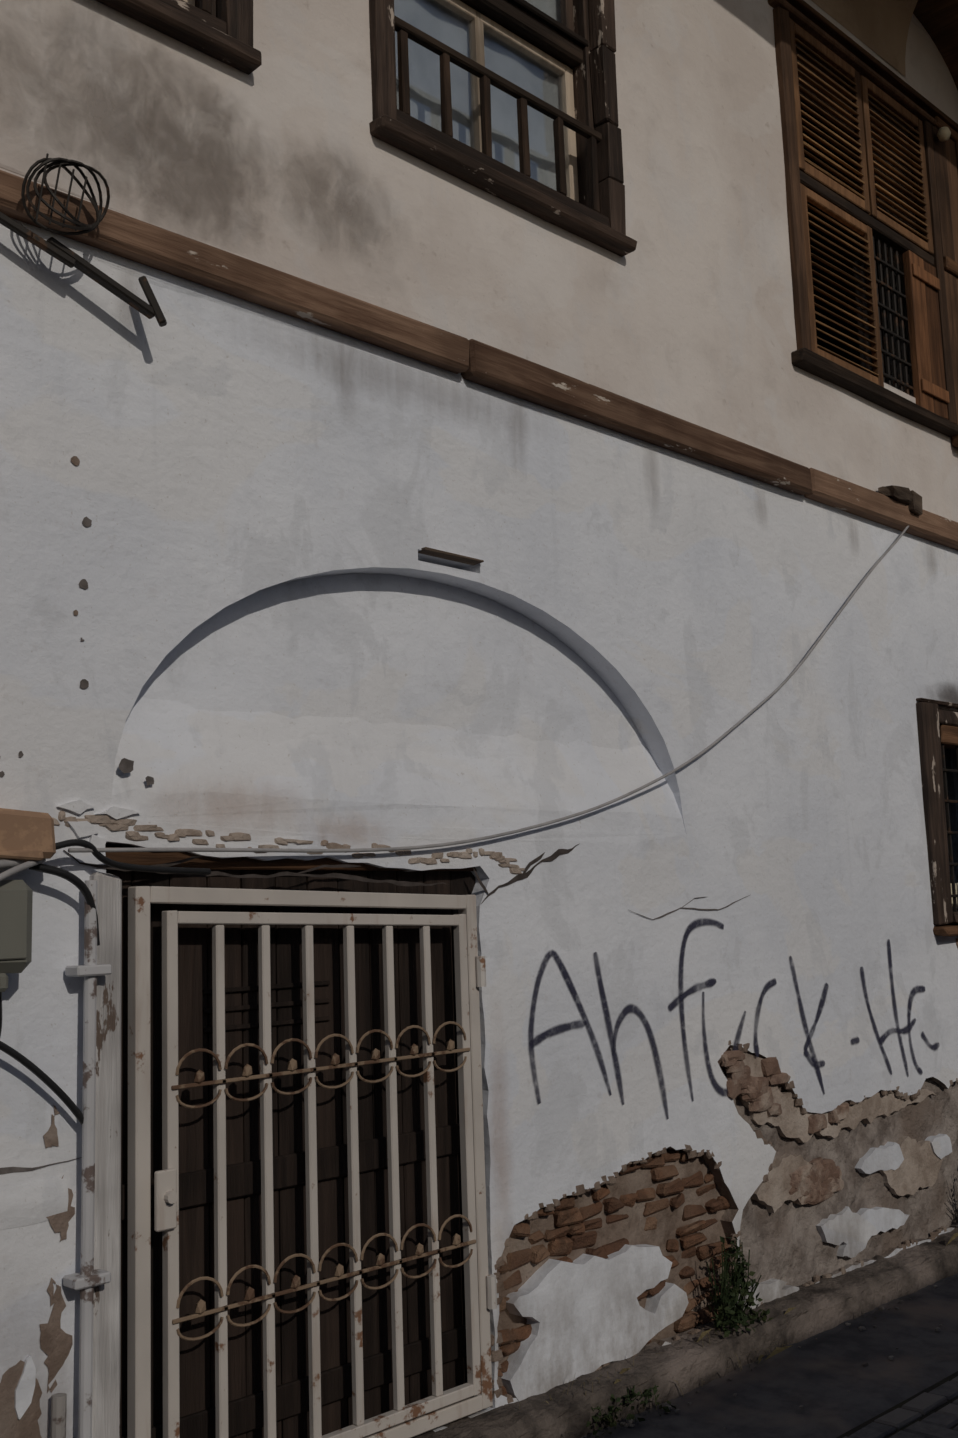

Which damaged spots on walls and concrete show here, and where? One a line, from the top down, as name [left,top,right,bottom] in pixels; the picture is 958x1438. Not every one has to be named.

spalling [119,758,154,786]
spalling [52,800,525,875]
peeling [43,1105,60,1148]
crack [0,1157,82,1175]
peeling [46,1175,75,1241]
spalling [490,1040,958,1404]
peeling [0,1278,73,1438]